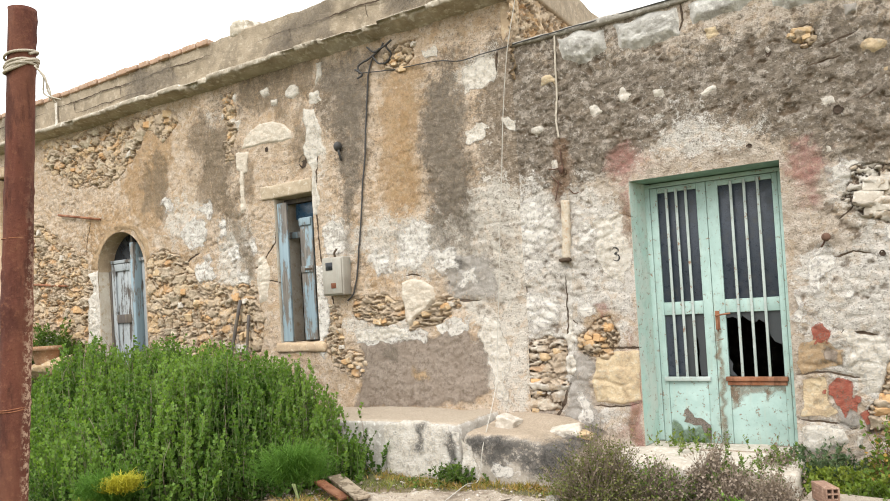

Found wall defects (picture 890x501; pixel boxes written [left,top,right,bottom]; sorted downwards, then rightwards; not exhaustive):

spalling [43,110,178,190]
spalling [221,90,241,164]
damp [417,74,470,247]
peeling [196,201,227,238]
spalling [840,163,890,239]
spalling [33,220,94,357]
spalling [146,238,266,364]
spalling [316,246,478,379]
spalling [528,297,621,412]
flaking render [797,339,843,417]
peeling [684,408,712,440]